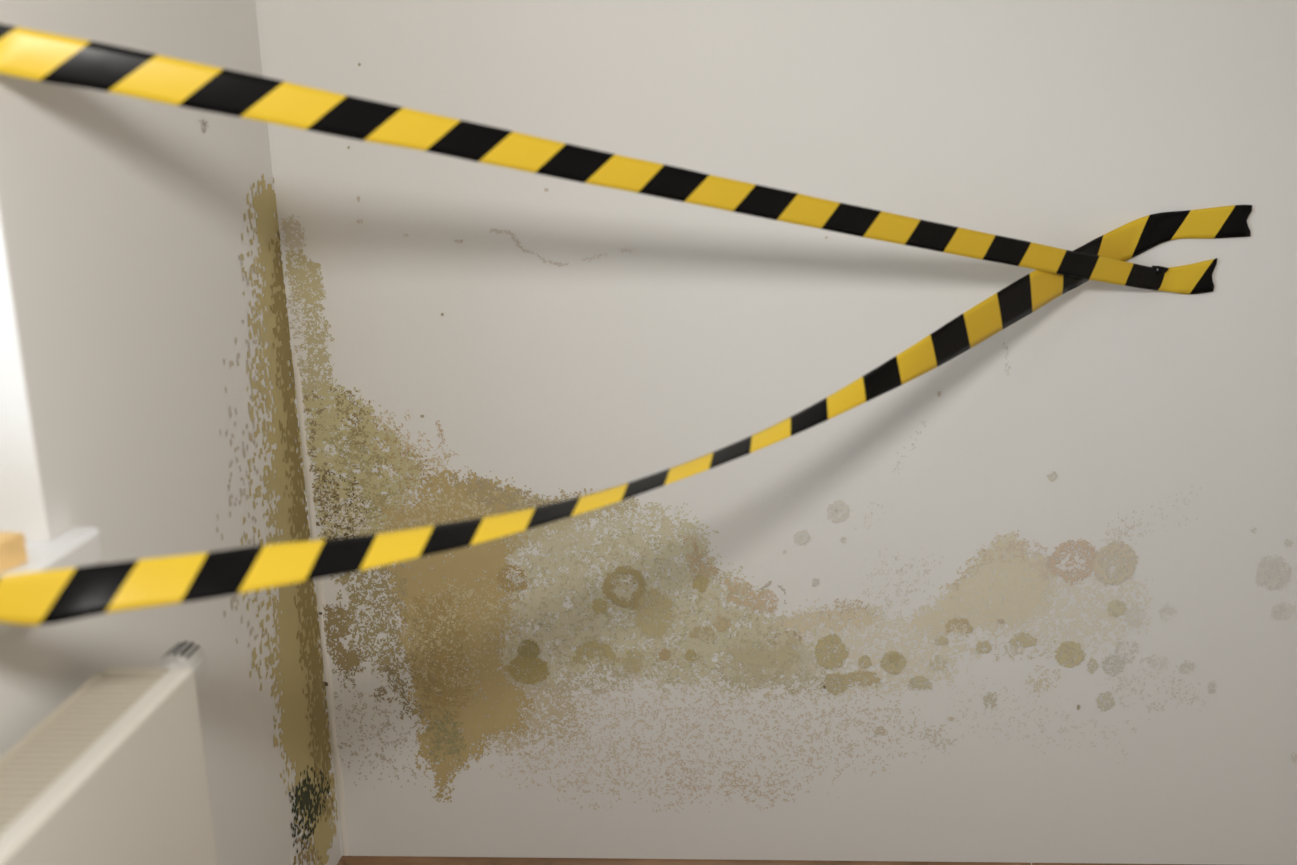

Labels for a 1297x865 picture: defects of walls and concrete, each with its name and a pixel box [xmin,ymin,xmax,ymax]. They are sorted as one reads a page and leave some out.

damp [216,174,1217,865]